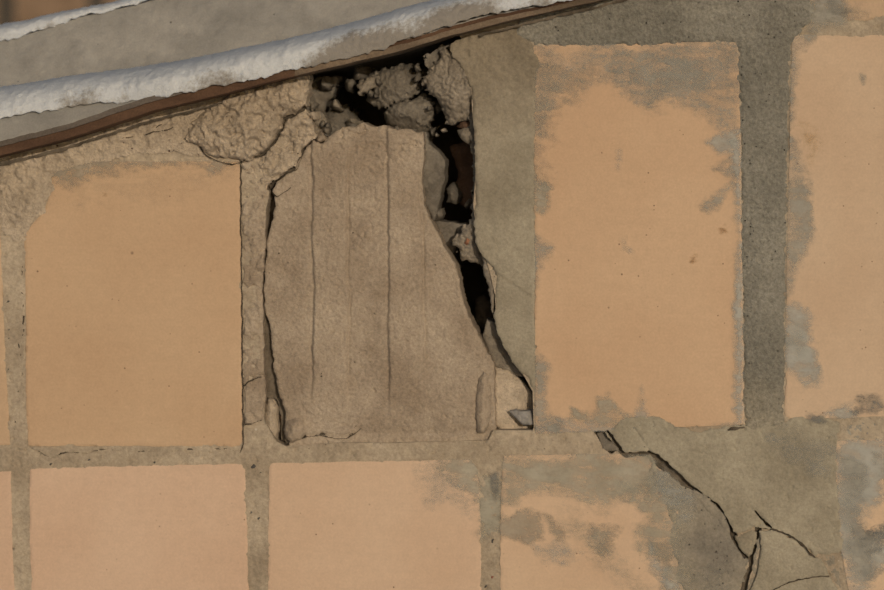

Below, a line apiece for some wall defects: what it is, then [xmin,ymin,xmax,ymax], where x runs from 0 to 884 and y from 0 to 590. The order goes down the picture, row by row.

damp [534,45,741,218]
spalling [241,44,534,450]
damp [733,270,744,420]
damp [441,454,691,590]
crack [608,431,829,590]